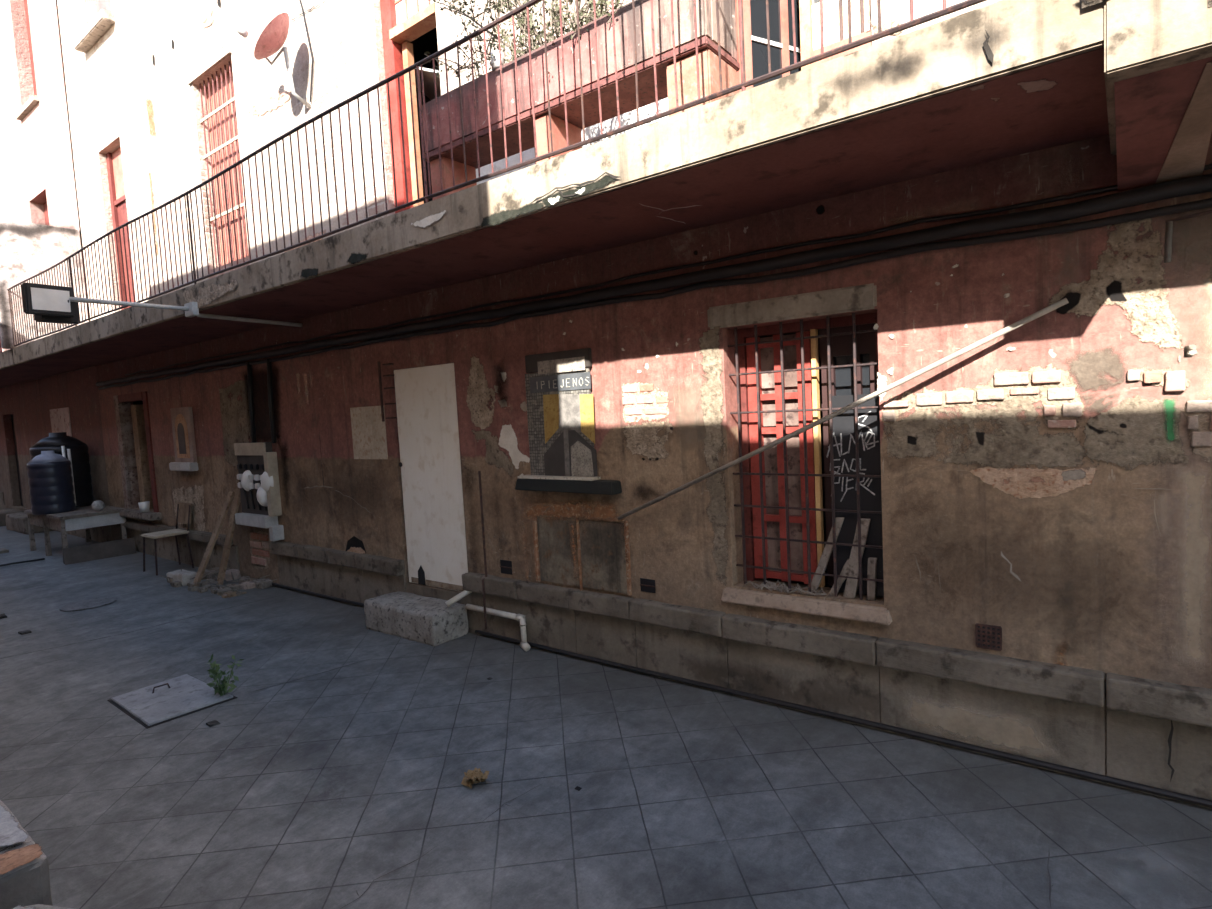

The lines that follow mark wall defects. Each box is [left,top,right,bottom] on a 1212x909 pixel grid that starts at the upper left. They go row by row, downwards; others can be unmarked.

damp [872,57,919,77]
spalling [466,356,530,476]
flaking render [621,370,674,461]
crack [1167,720,1175,782]